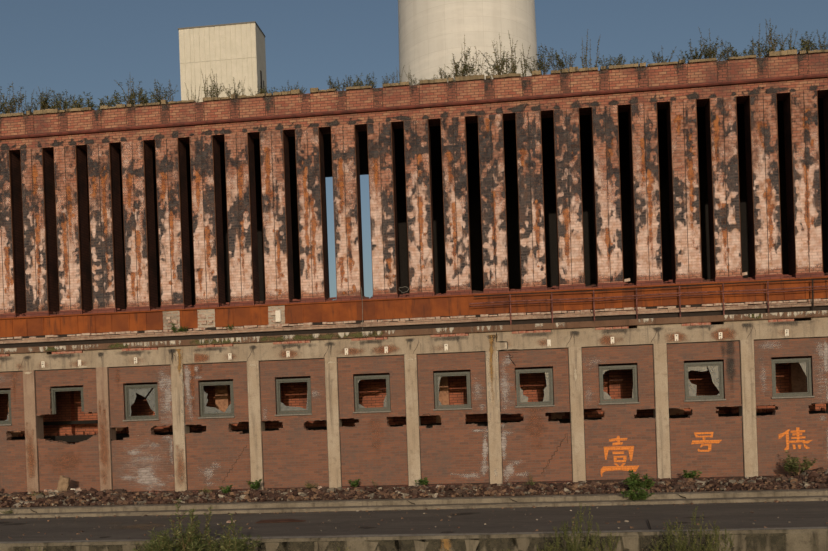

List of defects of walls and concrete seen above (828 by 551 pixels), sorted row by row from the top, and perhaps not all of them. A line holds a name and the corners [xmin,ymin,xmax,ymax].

water stain [159,191,183,300]
water stain [192,175,218,298]
water stain [226,175,253,297]
water stain [262,175,288,295]
water stain [483,200,508,283]
water stain [557,165,584,280]
water stain [594,153,623,277]
water stain [634,166,662,275]
water stain [674,177,701,274]
water stain [714,166,741,270]
water stain [753,149,782,269]
water stain [793,148,822,267]